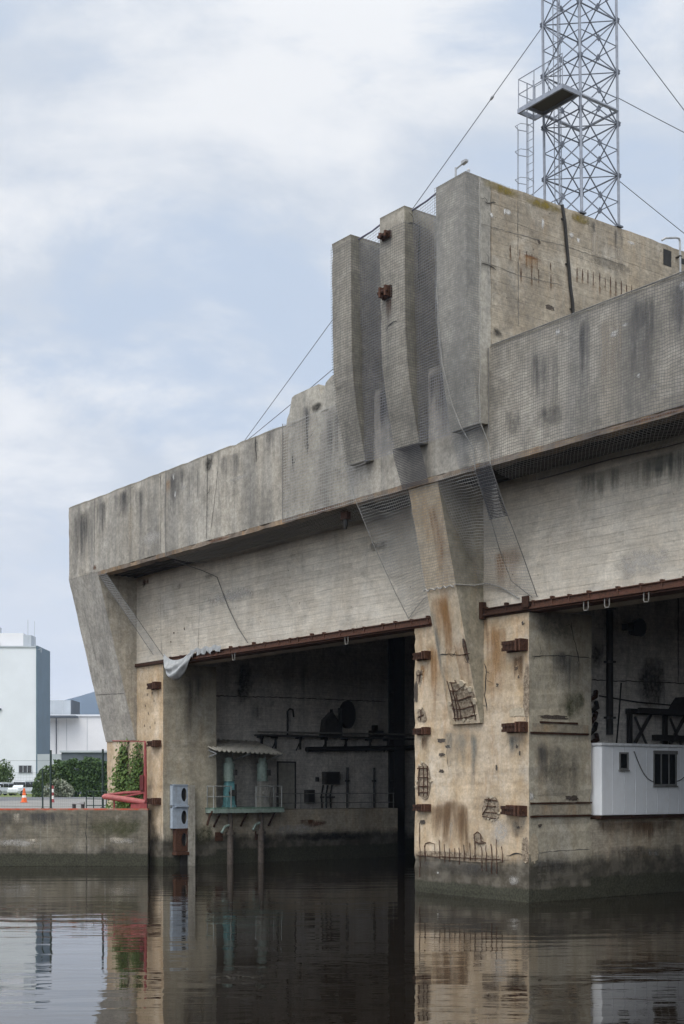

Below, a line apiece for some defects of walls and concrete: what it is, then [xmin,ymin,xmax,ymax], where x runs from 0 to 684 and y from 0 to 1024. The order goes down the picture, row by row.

spalling [447,680,477,722]
spalling [414,761,441,800]
spalling [482,795,500,821]
spalling [417,823,507,877]